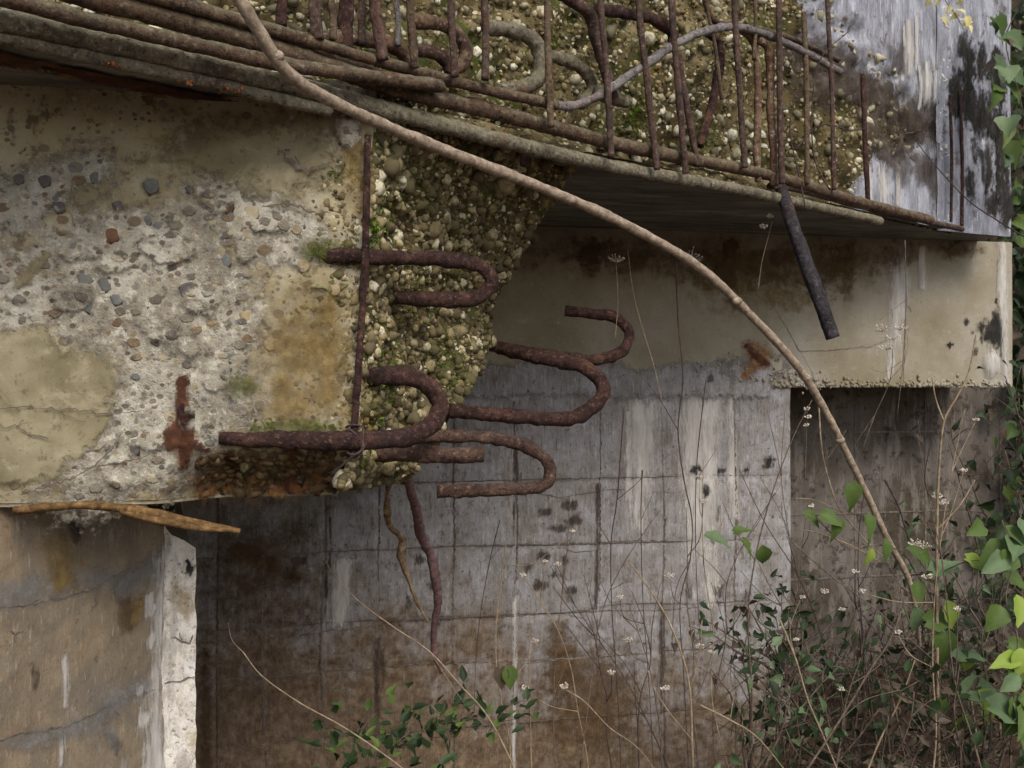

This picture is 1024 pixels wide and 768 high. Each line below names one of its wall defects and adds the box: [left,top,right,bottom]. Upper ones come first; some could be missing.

spalling [448,37,546,108]
spalling [431,0,602,95]
spalling [579,0,949,197]
efflorescence [901,16,937,109]
water stain [564,240,806,302]
spalling [0,120,642,525]
rust [741,340,770,379]
crack [0,404,151,493]
rust [162,373,210,470]
rust [197,449,338,496]
water stain [202,507,352,628]
water stain [546,627,634,746]